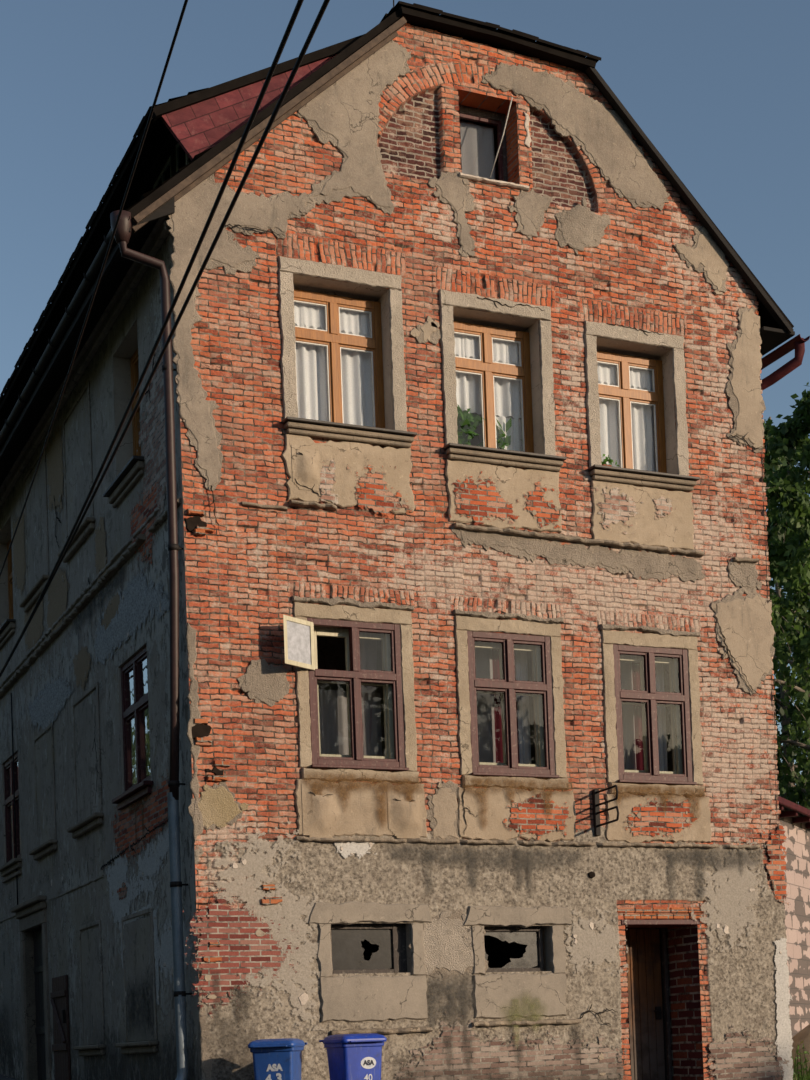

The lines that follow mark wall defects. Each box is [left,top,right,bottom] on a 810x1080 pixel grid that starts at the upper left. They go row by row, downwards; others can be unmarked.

peeling [481,62,670,212]
peeling [137,40,416,523]
peeling [427,171,475,257]
peeling [507,188,610,256]
peeling [672,225,729,295]
spalling [184,509,214,536]
peeling [449,471,705,583]
peeling [237,659,290,707]
flaking render [111,773,169,864]
flaking render [500,791,575,840]
flaking render [183,884,299,1018]